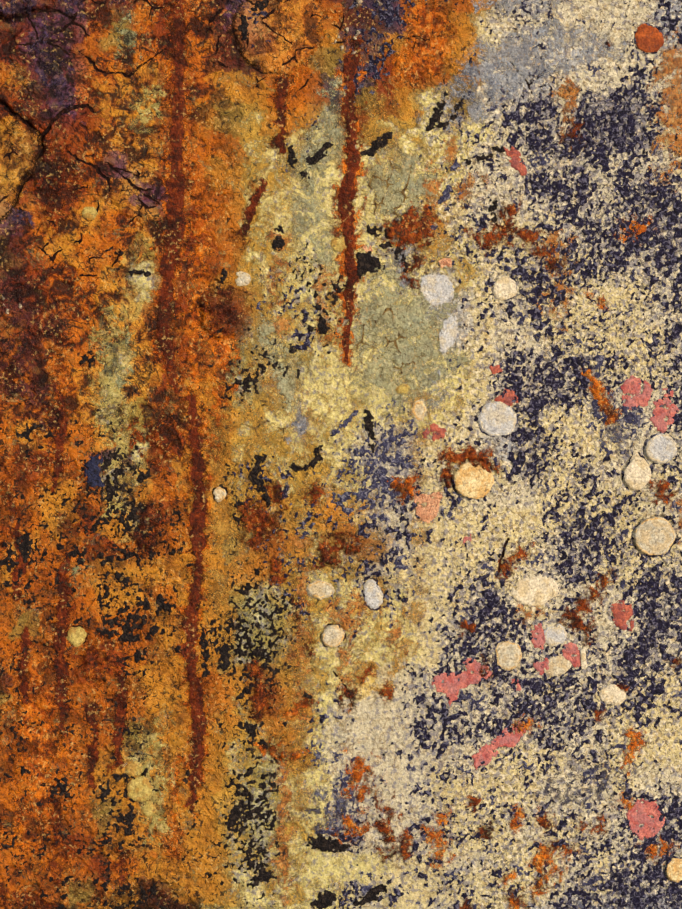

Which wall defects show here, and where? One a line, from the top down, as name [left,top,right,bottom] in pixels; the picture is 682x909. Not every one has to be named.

crack [0,0,166,78]
crack [0,102,163,223]
corrosion [647,27,682,192]
crack [37,220,122,277]
corrosion [0,0,501,909]